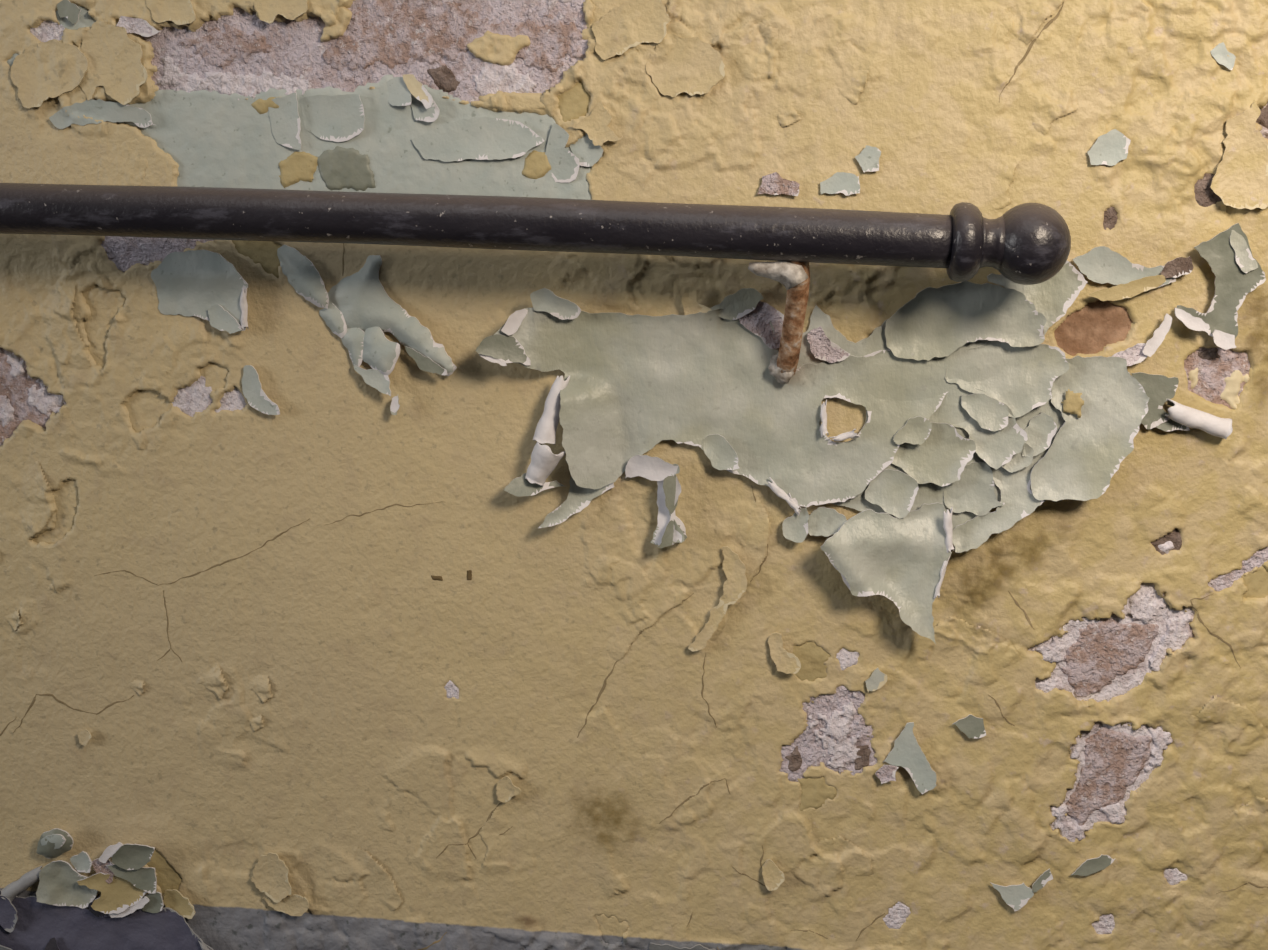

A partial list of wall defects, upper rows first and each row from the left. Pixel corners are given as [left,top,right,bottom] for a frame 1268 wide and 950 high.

peeling [7,0,725,200]
peeling [1210,42,1236,70]
peeling [0,347,66,446]
peeling [101,236,457,415]
peeling [476,101,1268,652]
peeling [1028,583,1195,702]
peeling [768,632,937,811]
peeling [1050,722,1173,842]
peeling [0,828,213,950]
peeling [251,852,309,916]
peeling [762,859,785,891]
peeling [990,868,1053,911]